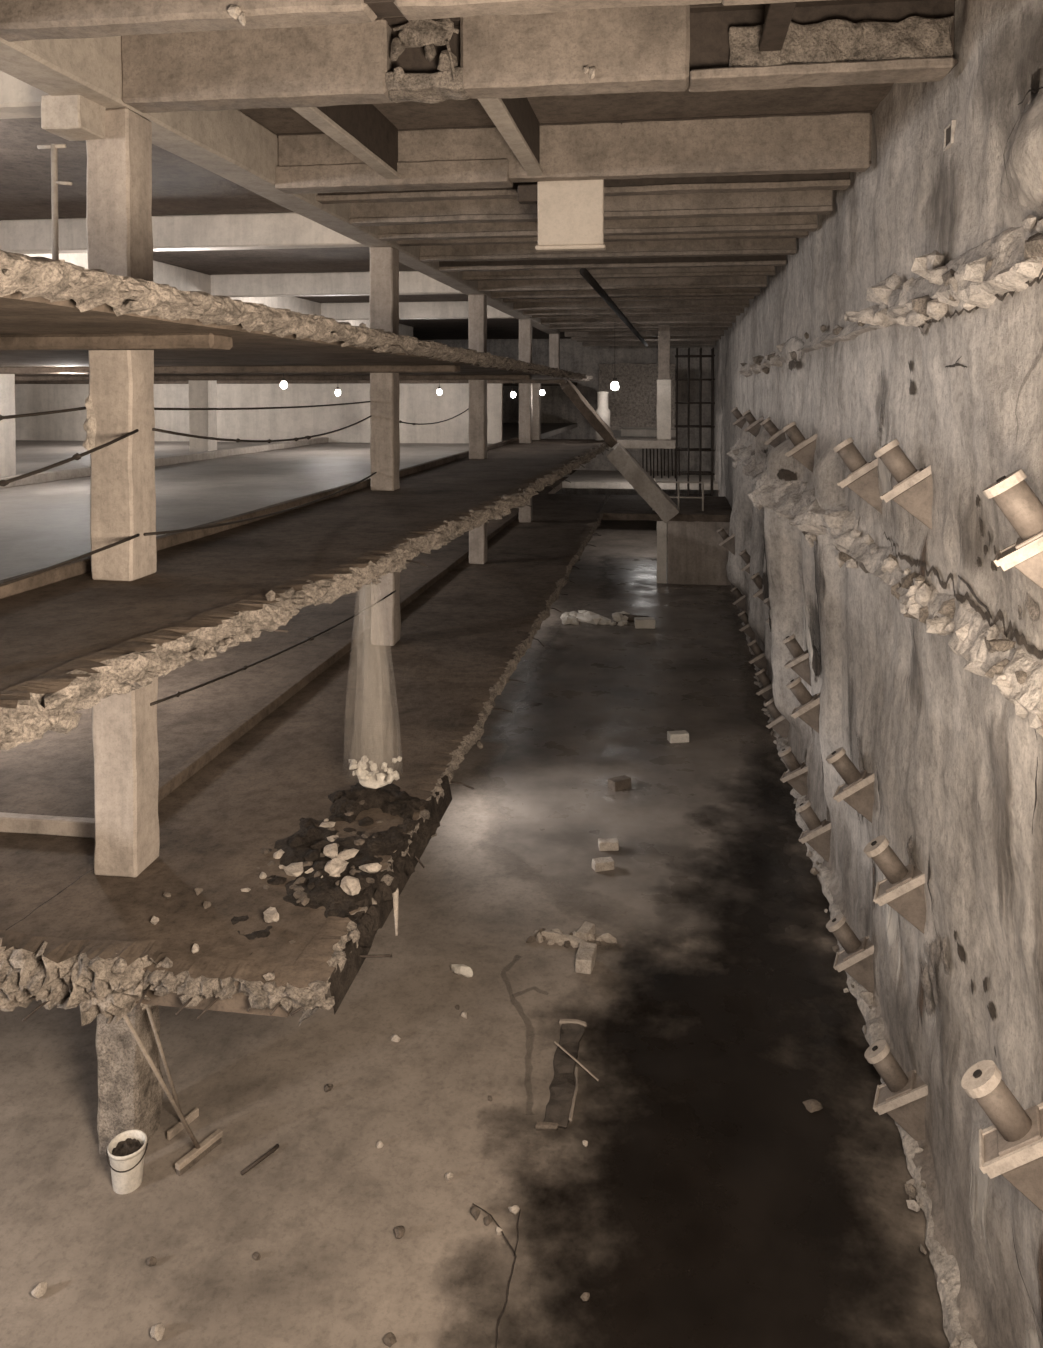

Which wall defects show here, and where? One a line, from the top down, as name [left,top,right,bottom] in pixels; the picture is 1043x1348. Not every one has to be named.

spalling [390,18,459,83]
peeling [804,250,994,339]
peeling [740,351,801,377]
spalling [0,440,610,751]
crack [884,532,1043,660]
spalling [378,513,605,886]
spalling [0,898,392,1026]
damp [476,754,938,1348]
damp [970,1138,988,1241]